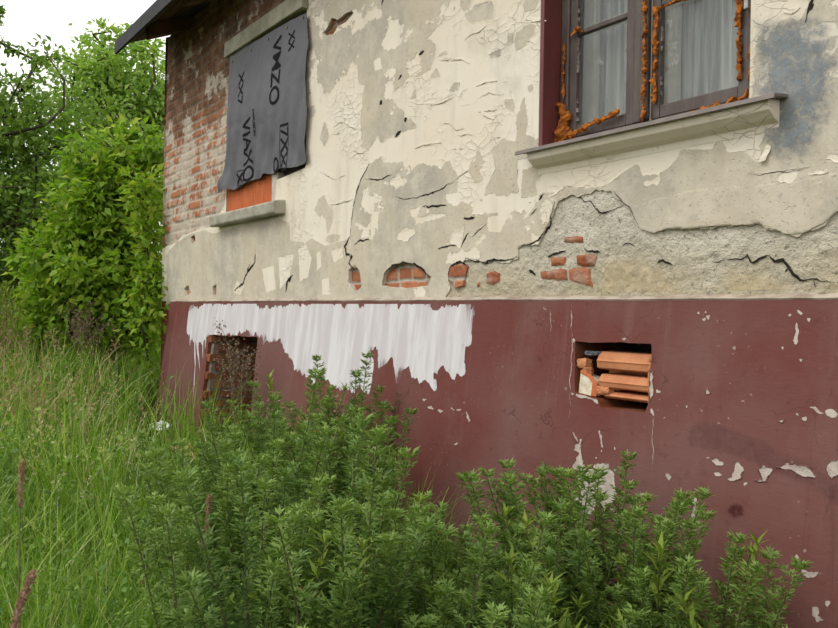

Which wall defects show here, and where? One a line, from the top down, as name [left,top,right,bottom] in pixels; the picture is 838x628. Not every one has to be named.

crack [784,0,814,23]
damp [760,24,834,152]
flaking render [163,0,838,304]
crack [326,151,393,269]
crack [394,170,468,208]
crack [578,192,635,219]
crack [382,192,599,282]
crack [714,254,838,287]
peeling [810,406,838,418]
peeling [571,430,619,514]
peeling [706,457,817,486]
peeling [825,457,838,479]